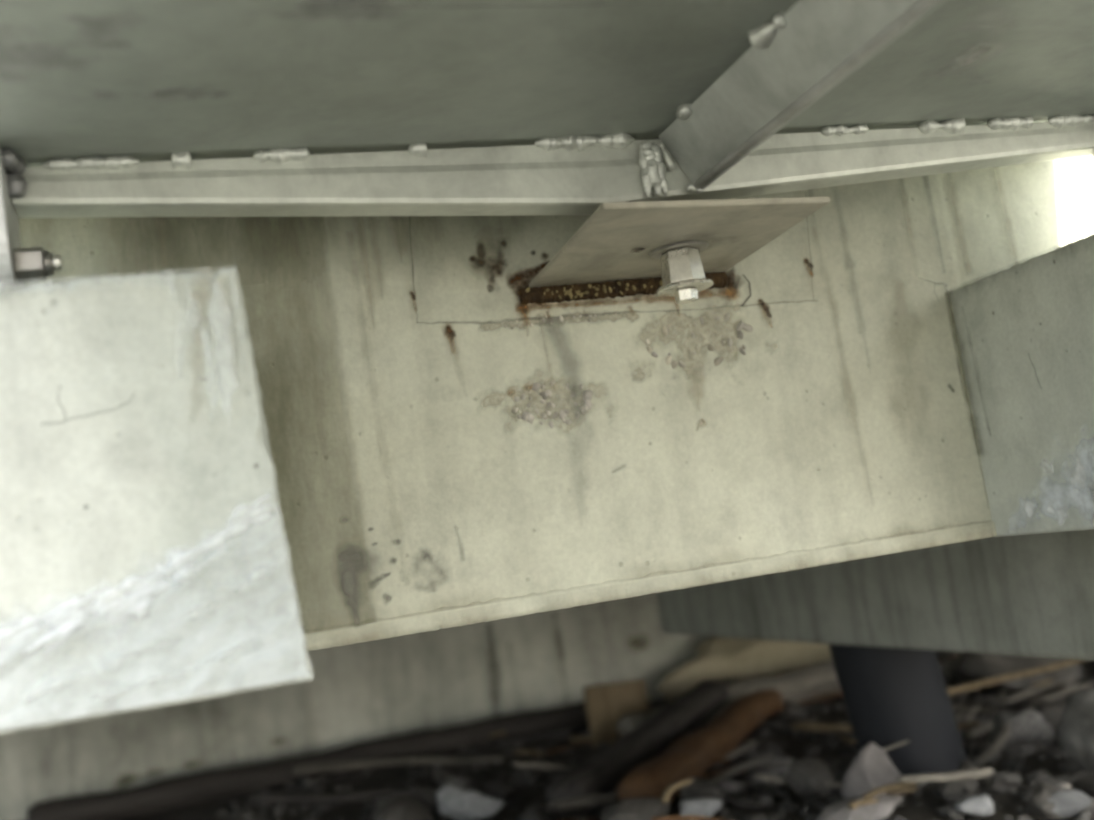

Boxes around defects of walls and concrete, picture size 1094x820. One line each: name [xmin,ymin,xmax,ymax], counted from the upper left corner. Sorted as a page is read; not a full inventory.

rust [470,241,679,324]
rust [698,266,740,297]
spalling [481,305,753,375]
spalling [482,373,603,430]
damp [339,549,368,624]
damp [372,558,396,601]